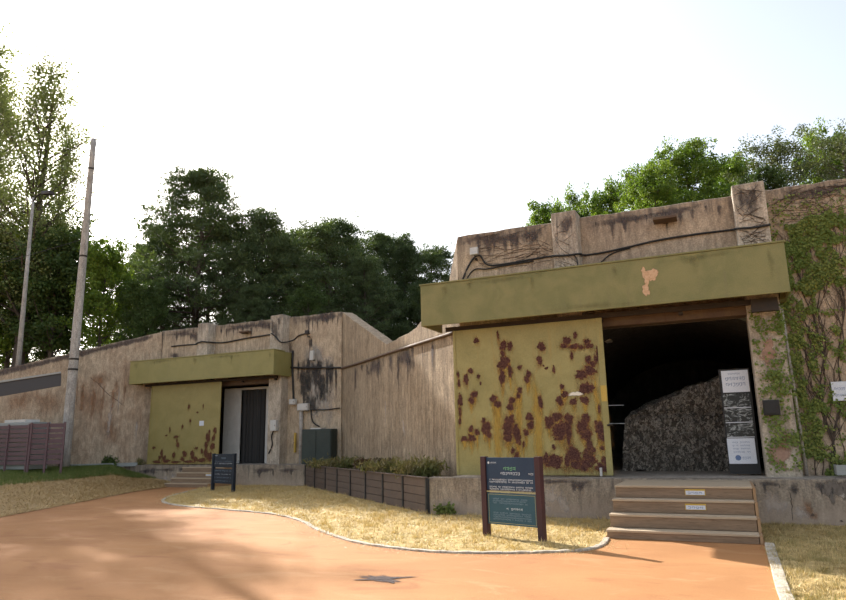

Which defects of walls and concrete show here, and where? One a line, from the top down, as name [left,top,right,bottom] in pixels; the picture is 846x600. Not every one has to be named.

leakage [595,215,647,234]
leakage [468,230,537,253]
peeling [641,267,658,296]
corrosion [457,330,613,472]
corrosion [152,404,217,463]